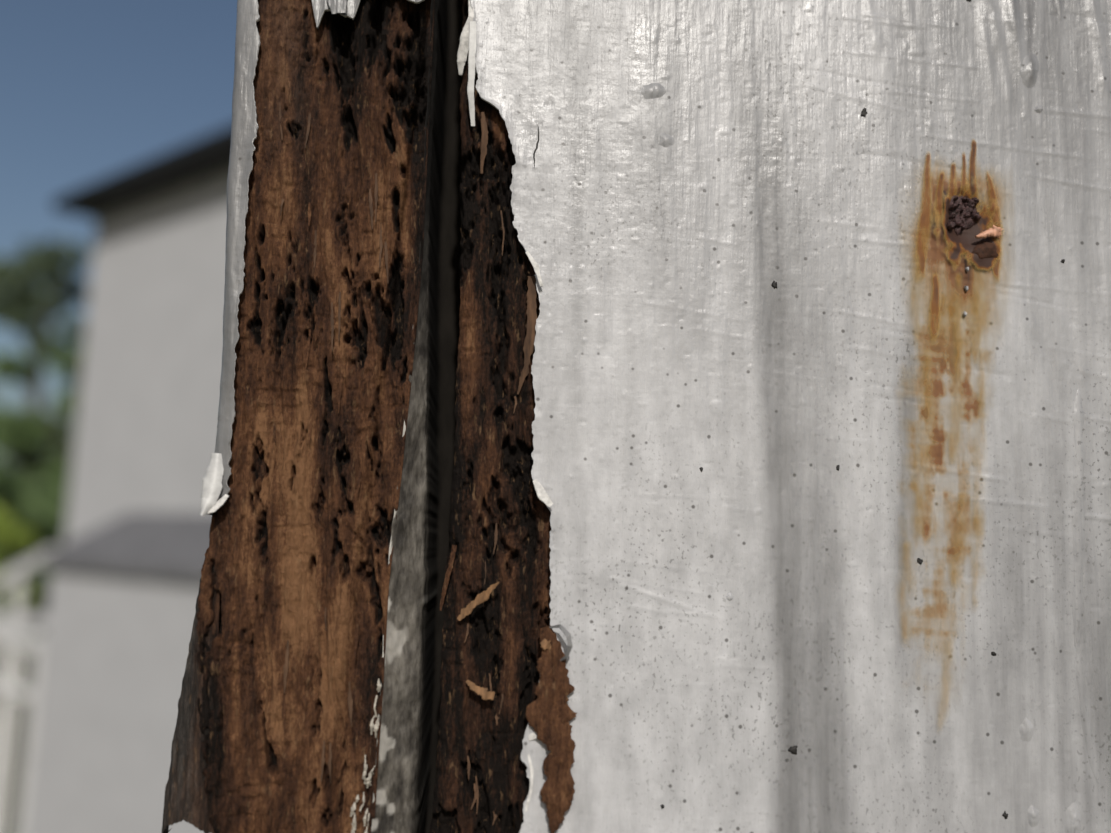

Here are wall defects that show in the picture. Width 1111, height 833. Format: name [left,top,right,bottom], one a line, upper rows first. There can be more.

peeling [327,0,347,14]
peeling [457,0,476,127]
peeling [525,251,543,287]
rust [912,140,1001,560]
crack [424,0,463,833]
peeling [200,453,229,516]
peeling [533,479,553,507]
peeling [525,624,577,833]